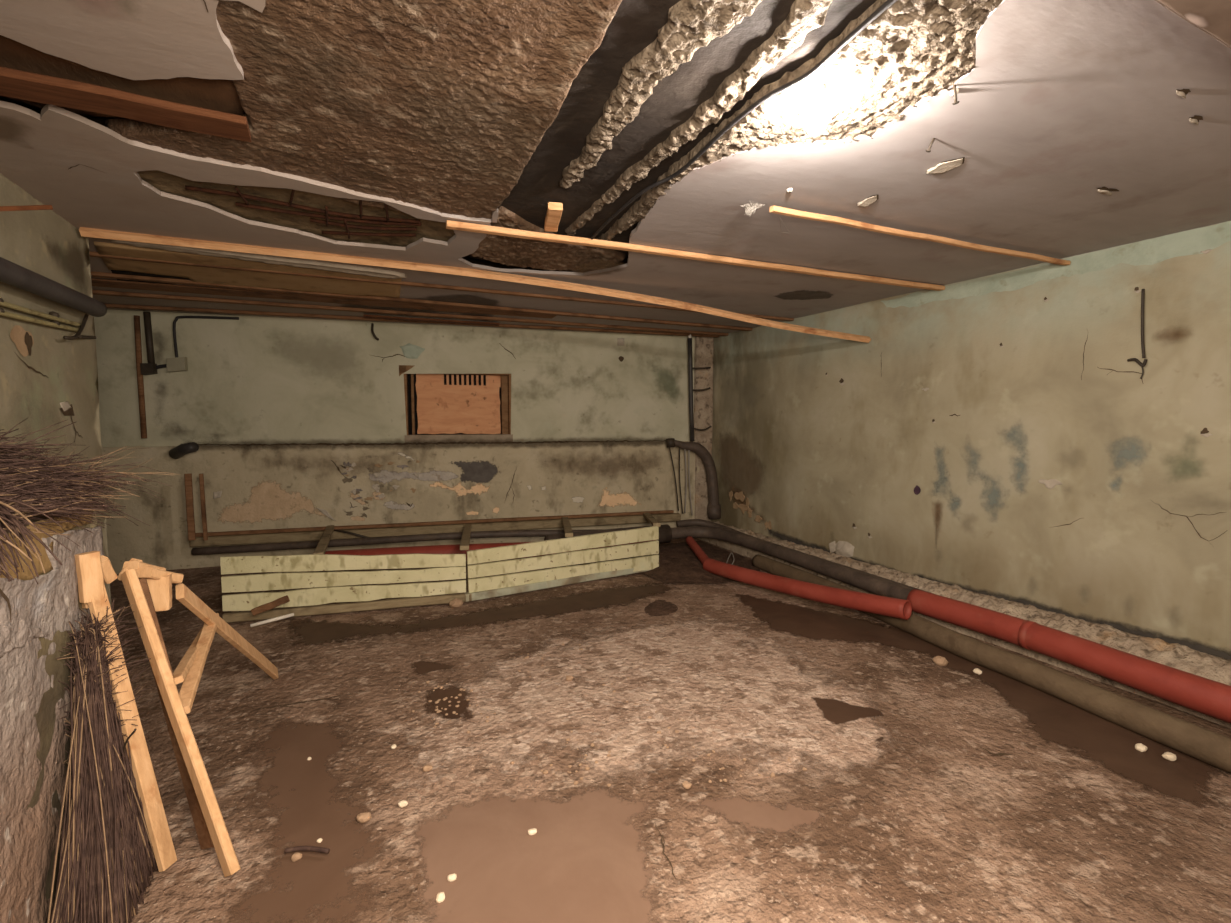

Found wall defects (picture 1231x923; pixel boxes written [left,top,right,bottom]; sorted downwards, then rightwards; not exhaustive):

peeling [926,157,965,174]
spalling [138,170,455,247]
peeling [857,195,879,207]
peeling [1097,187,1119,196]
peeling [341,453,490,517]
peeling [598,487,637,507]
crack [1151,500,1226,544]